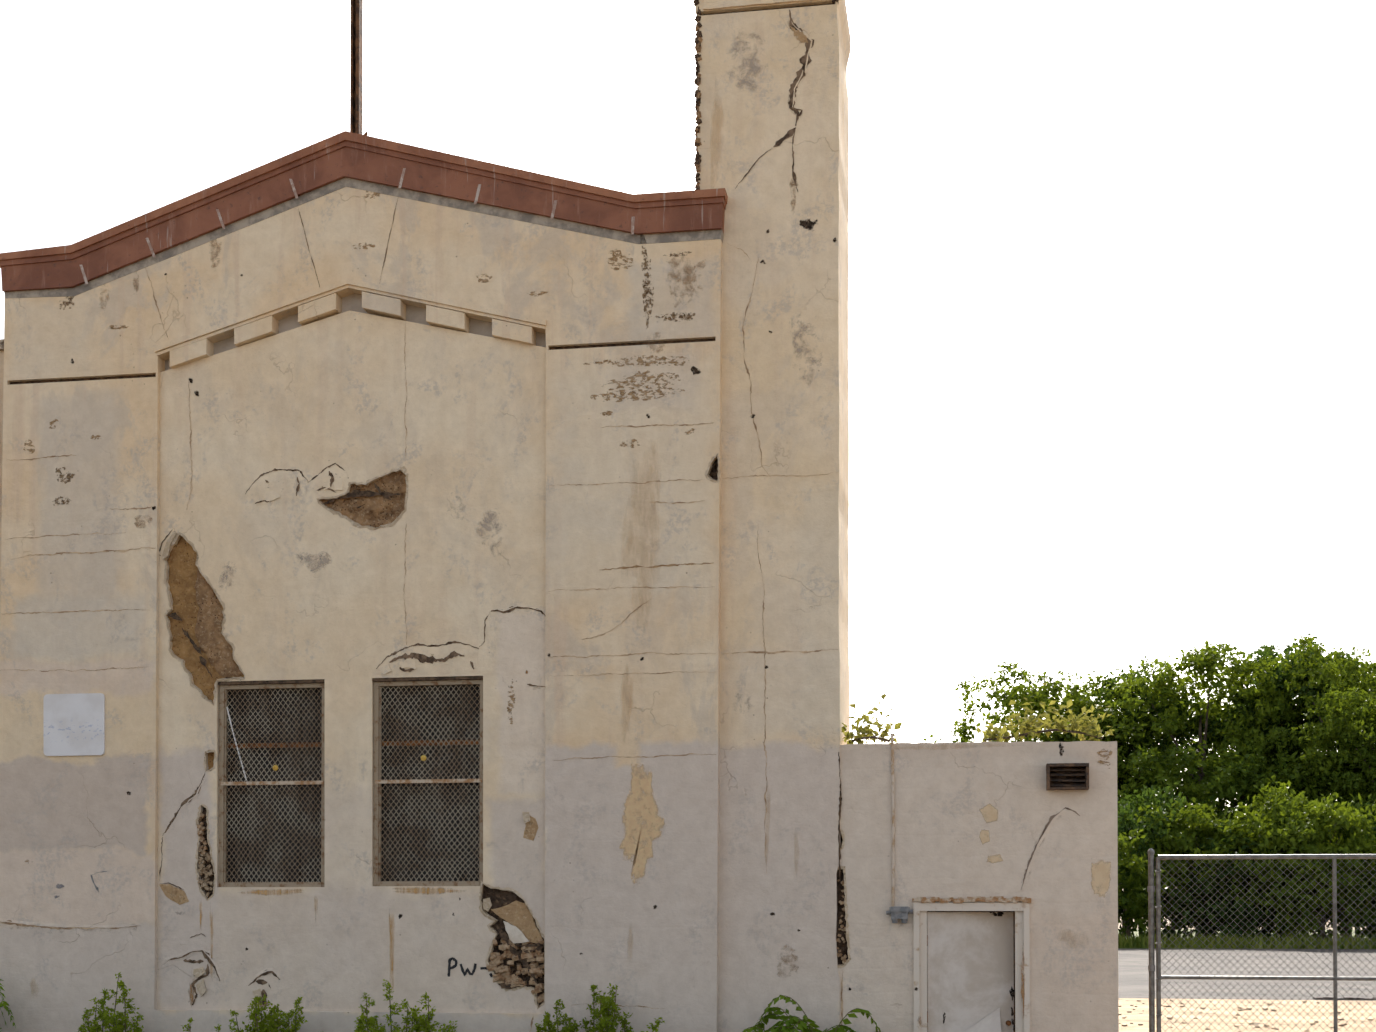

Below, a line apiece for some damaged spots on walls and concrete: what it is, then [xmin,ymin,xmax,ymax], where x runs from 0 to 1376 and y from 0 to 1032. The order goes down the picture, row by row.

spalling [693,0,703,190]
crack [737,9,814,192]
peeling [608,250,633,270]
peeling [585,355,687,418]
flaking render [317,466,409,530]
flaking render [159,530,245,705]
crack [0,919,142,930]
flaking render [159,804,216,905]
flaking render [479,881,545,1009]
flaking render [836,829,851,968]
crack [1021,807,1080,891]